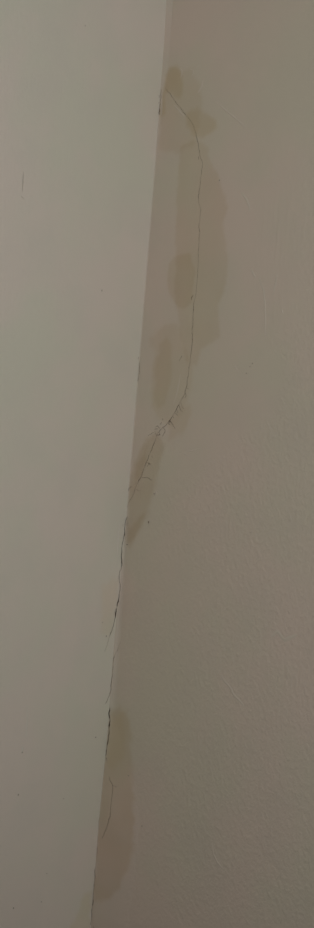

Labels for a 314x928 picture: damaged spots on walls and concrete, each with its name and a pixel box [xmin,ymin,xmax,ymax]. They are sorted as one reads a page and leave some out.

water stain [124,59,230,553]
water stain [65,701,140,928]